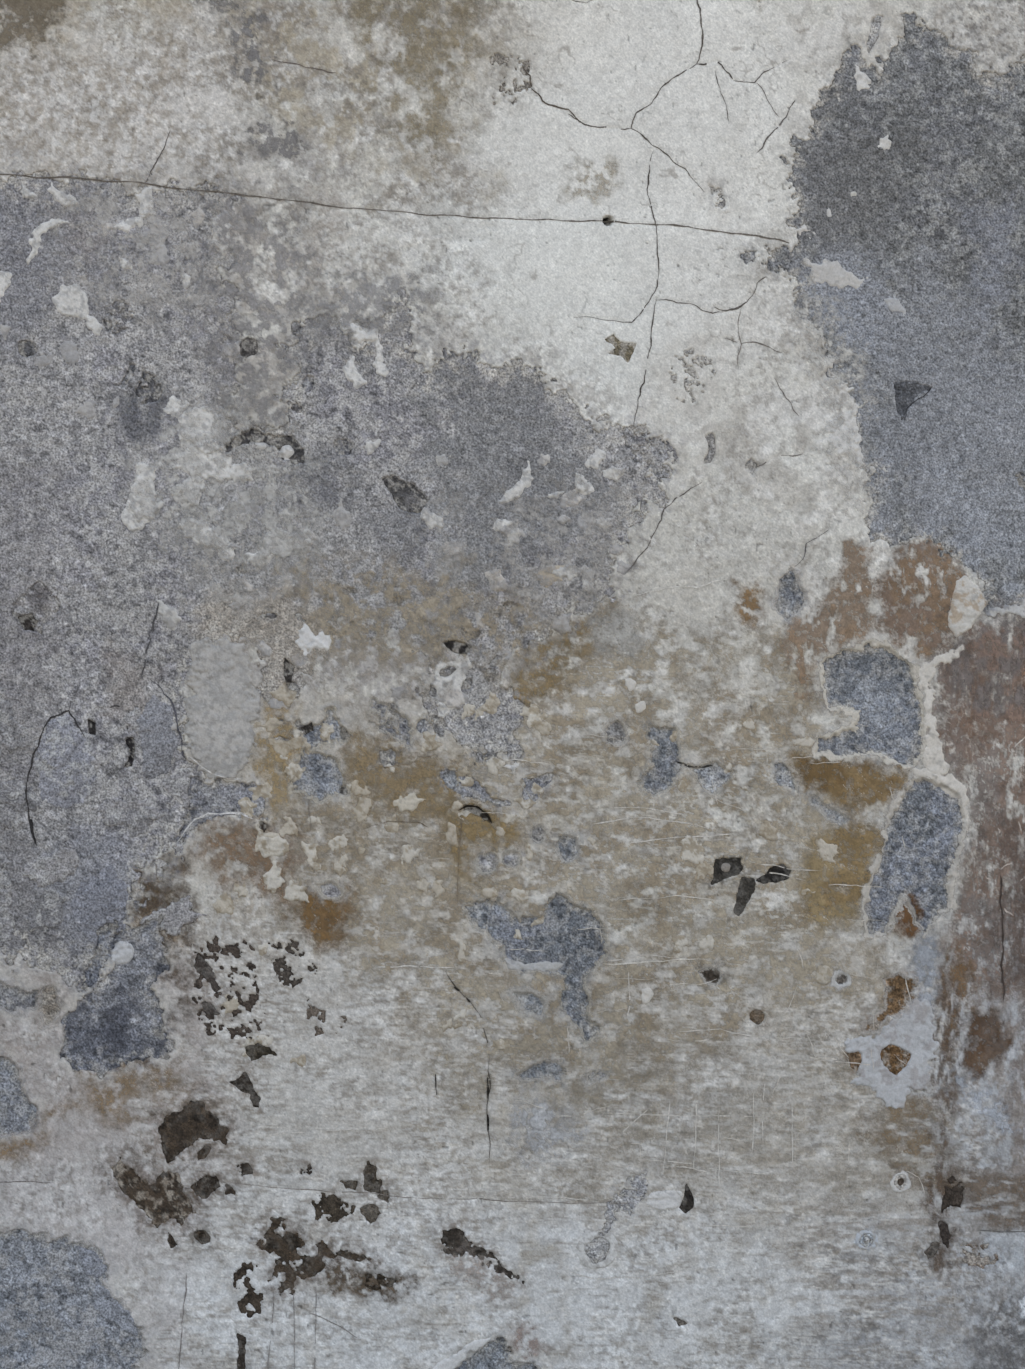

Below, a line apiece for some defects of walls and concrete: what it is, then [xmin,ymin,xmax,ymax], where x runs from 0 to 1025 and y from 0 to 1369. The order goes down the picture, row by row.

crack [0,0,799,426]
spalling [740,12,1025,938]
spalling [0,170,678,1082]
damp [192,603,908,1167]
flaking render [671,934,722,988]
flaking render [680,835,815,916]
flaking render [815,965,851,989]
rust [780,538,1025,1271]
spalling [0,1056,38,1138]
spalling [0,1229,148,1369]
spalling [433,1335,540,1369]